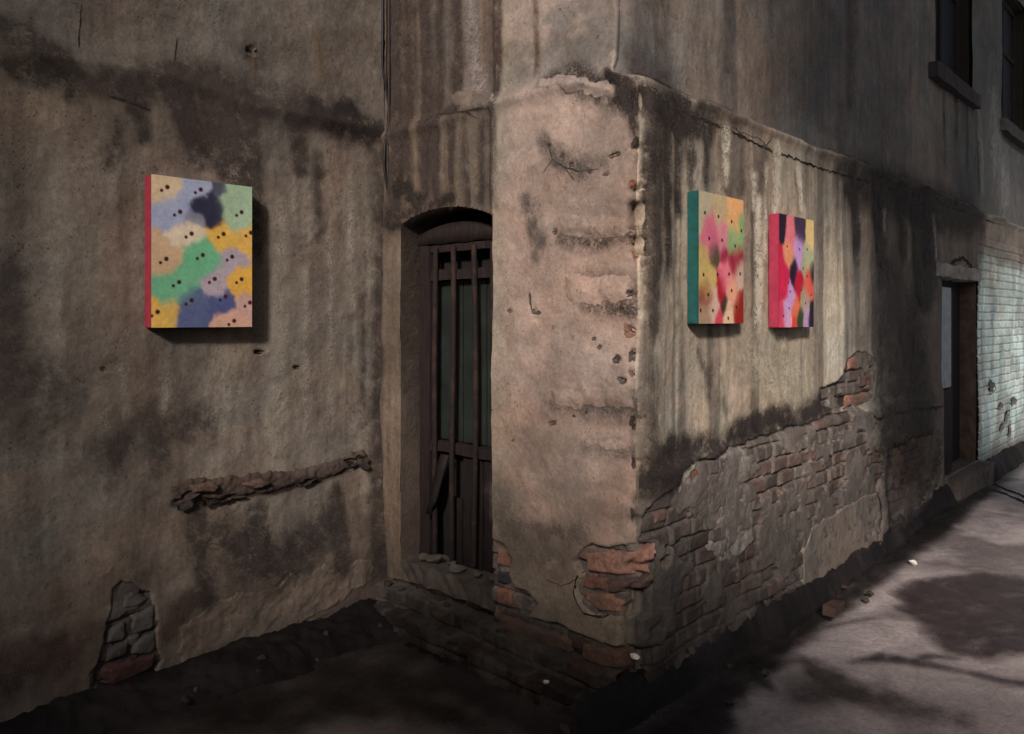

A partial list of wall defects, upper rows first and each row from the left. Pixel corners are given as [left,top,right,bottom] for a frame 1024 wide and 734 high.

crack [543,145,594,178]
spalling [608,137,639,158]
crack [646,86,1007,227]
water stain [92,0,500,577]
spalling [612,324,636,384]
water stain [637,82,844,496]
water stain [827,156,987,533]
peeling [988,379,1017,437]
flaking render [395,351,883,683]
flaking render [90,580,161,688]